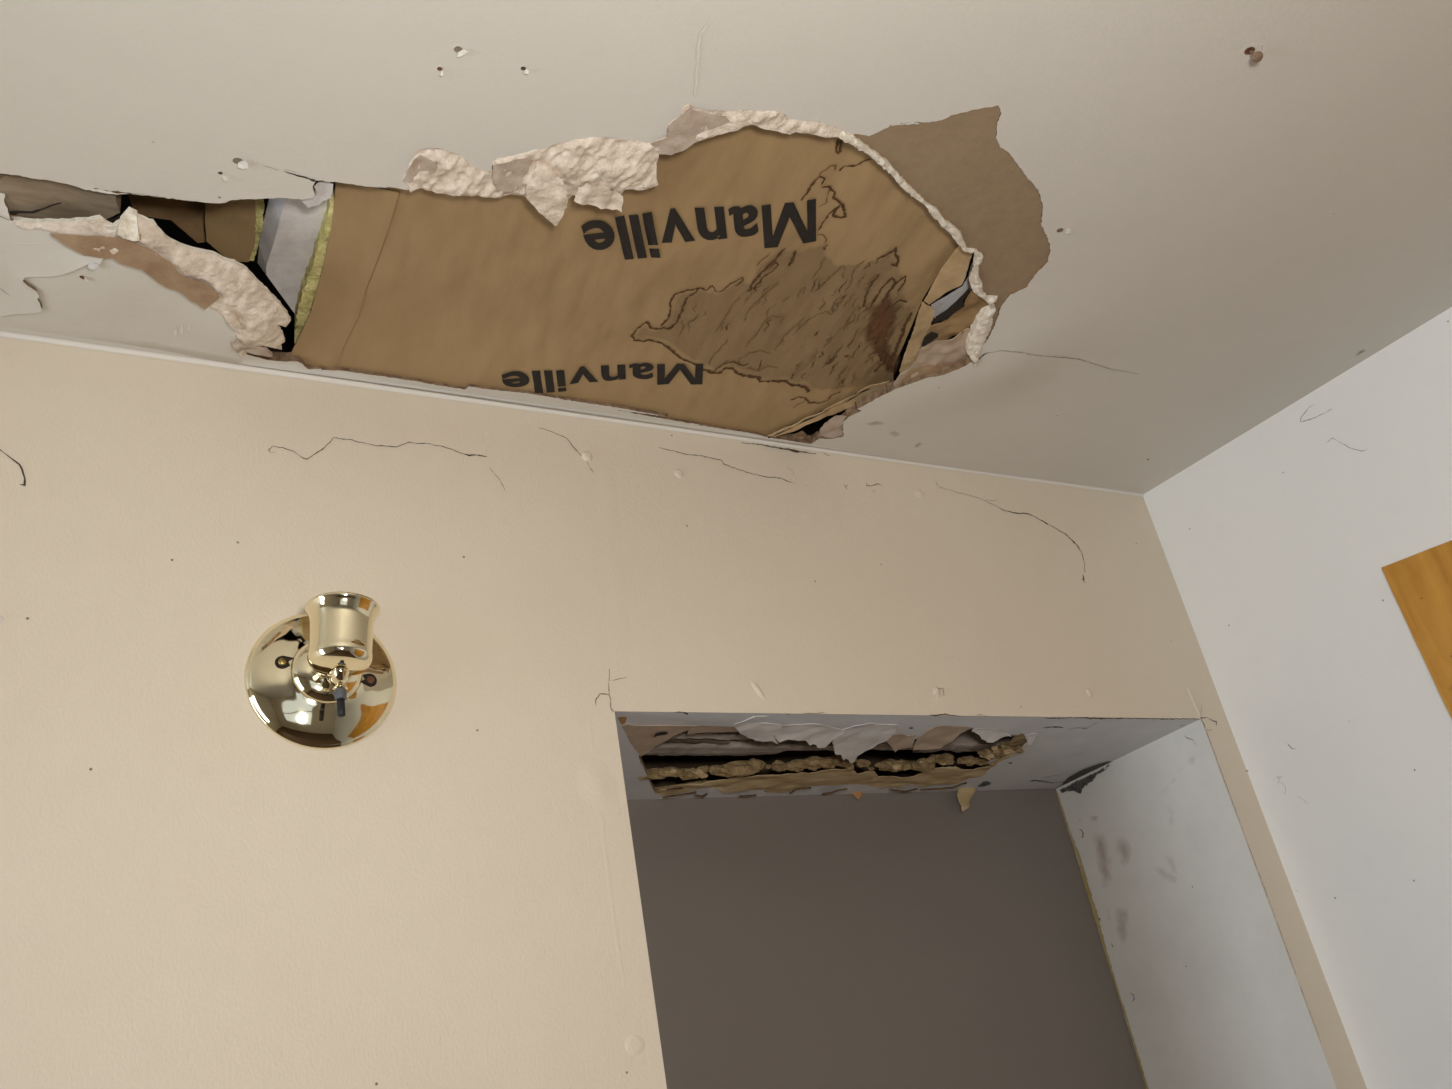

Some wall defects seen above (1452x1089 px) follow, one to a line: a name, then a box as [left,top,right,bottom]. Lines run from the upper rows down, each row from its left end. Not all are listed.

spalling [104,194,132,230]
peeling [0,243,103,316]
spalling [147,198,295,352]
water stain [630,138,913,407]
spalling [893,253,974,381]
spalling [782,393,856,436]
crack [0,449,26,486]
crack [268,437,505,489]
crack [936,483,1086,583]
peeling [641,716,1037,787]
peeling [957,788,977,812]